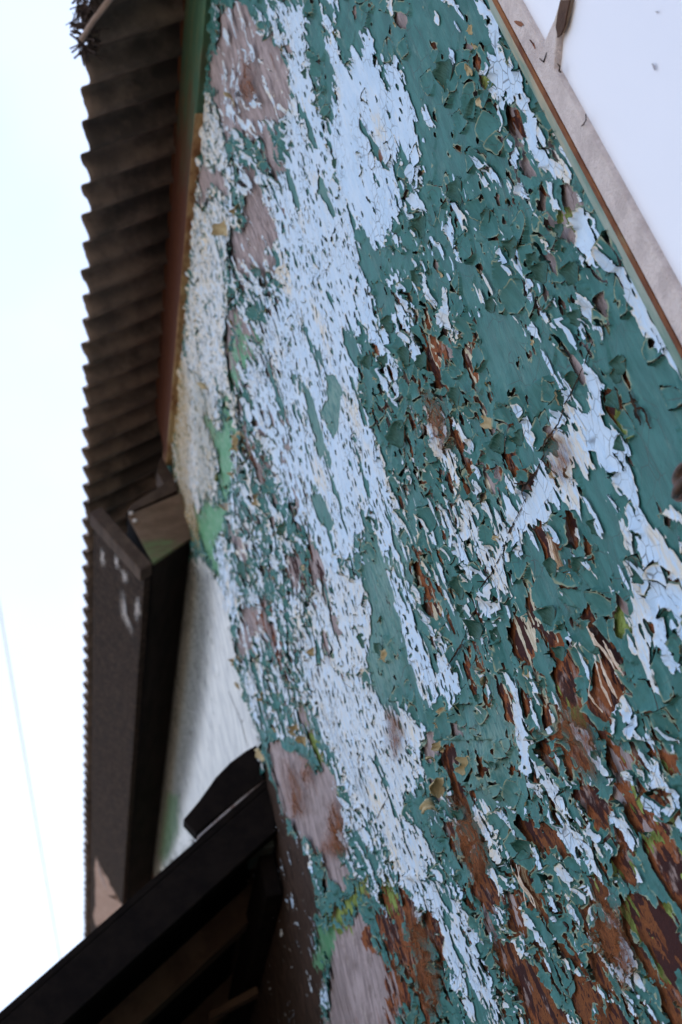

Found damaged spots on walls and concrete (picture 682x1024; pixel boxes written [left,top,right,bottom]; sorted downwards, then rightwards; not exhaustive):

peeling [153,0,682,1024]